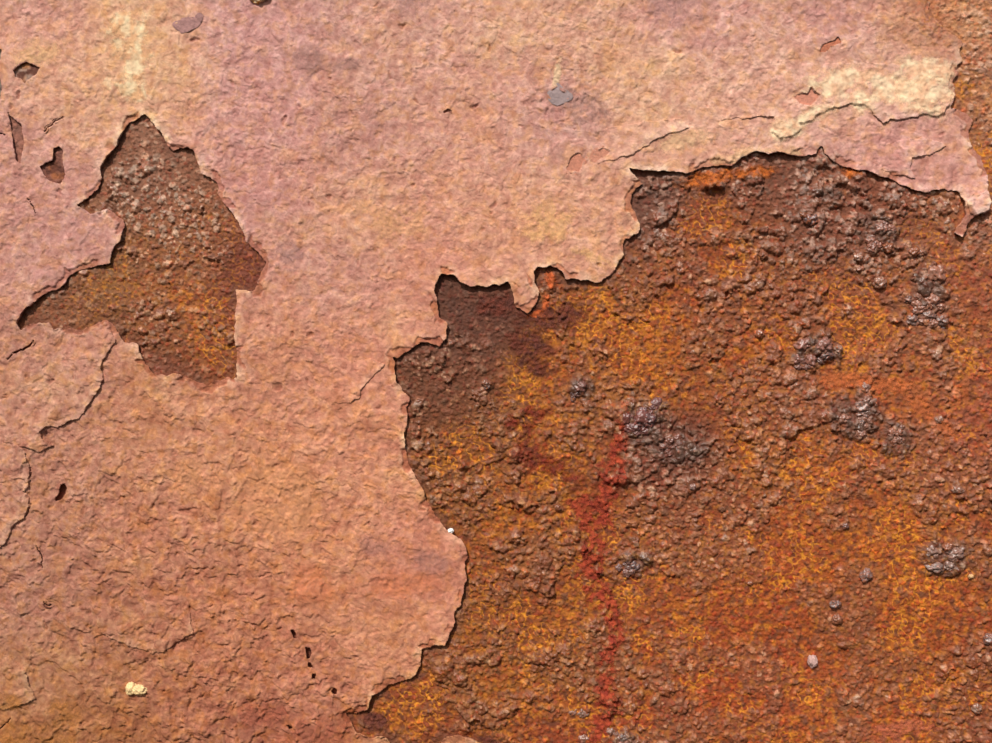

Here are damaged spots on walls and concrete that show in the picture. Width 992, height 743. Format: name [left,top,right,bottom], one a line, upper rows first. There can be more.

peeling [14,62,39,83]
peeling [0,113,266,547]
corrosion [477,272,582,376]
peeling [332,0,992,743]
corrosion [687,166,774,186]
corrosion [505,406,632,742]